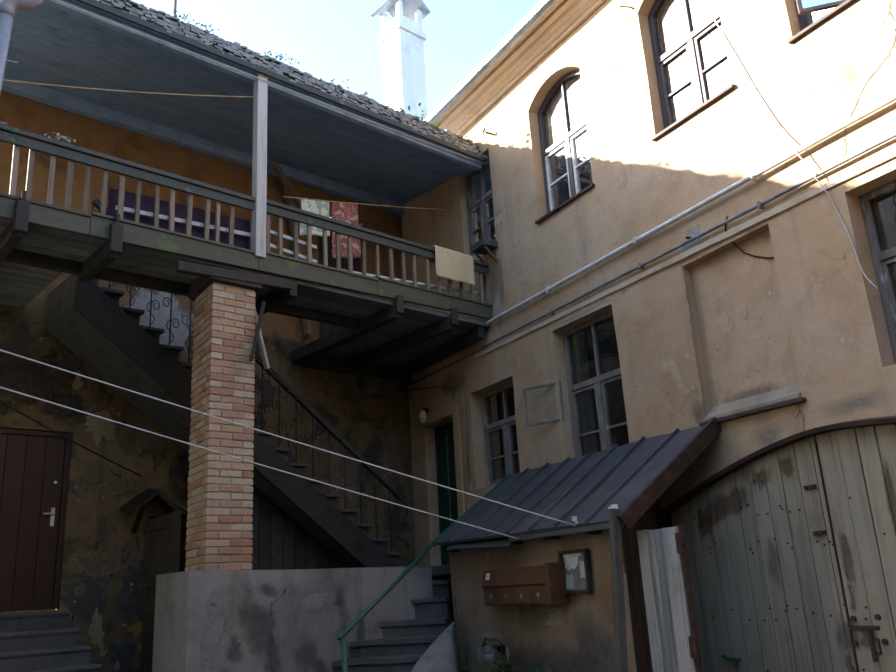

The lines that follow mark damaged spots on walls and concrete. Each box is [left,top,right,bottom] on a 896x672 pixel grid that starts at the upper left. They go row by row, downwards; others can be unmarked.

crack [844,1,896,156]
water stain [40,396,84,419]